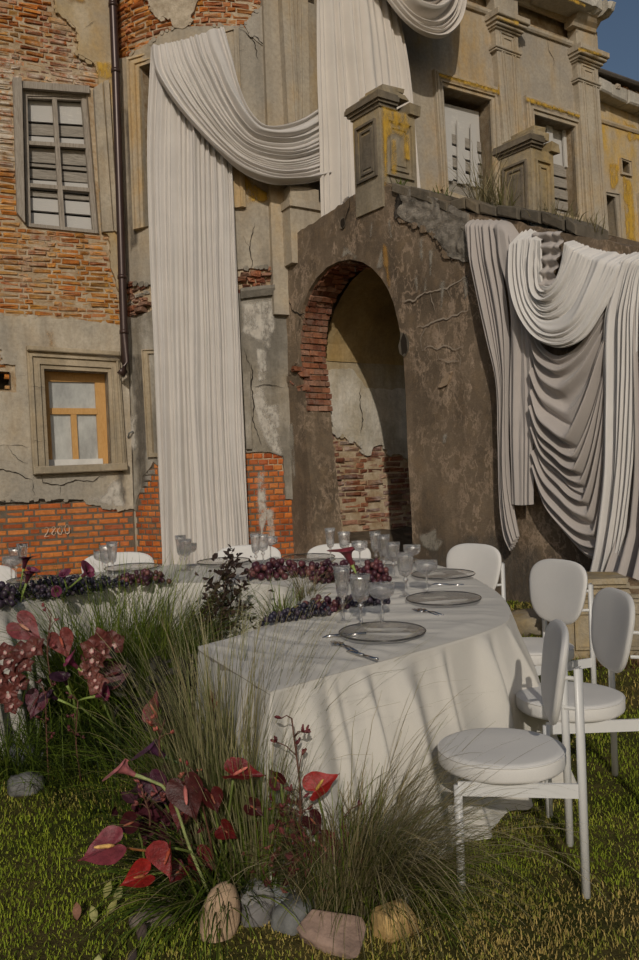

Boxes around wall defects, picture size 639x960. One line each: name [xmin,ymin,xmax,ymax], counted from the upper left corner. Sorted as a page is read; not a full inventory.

flaking render [117,0,175,58]
flaking render [188,0,263,46]
flaking render [0,0,130,325]
peeling [286,249,412,532]
crack [0,440,104,492]
peeling [0,496,81,504]
peeling [94,481,124,512]